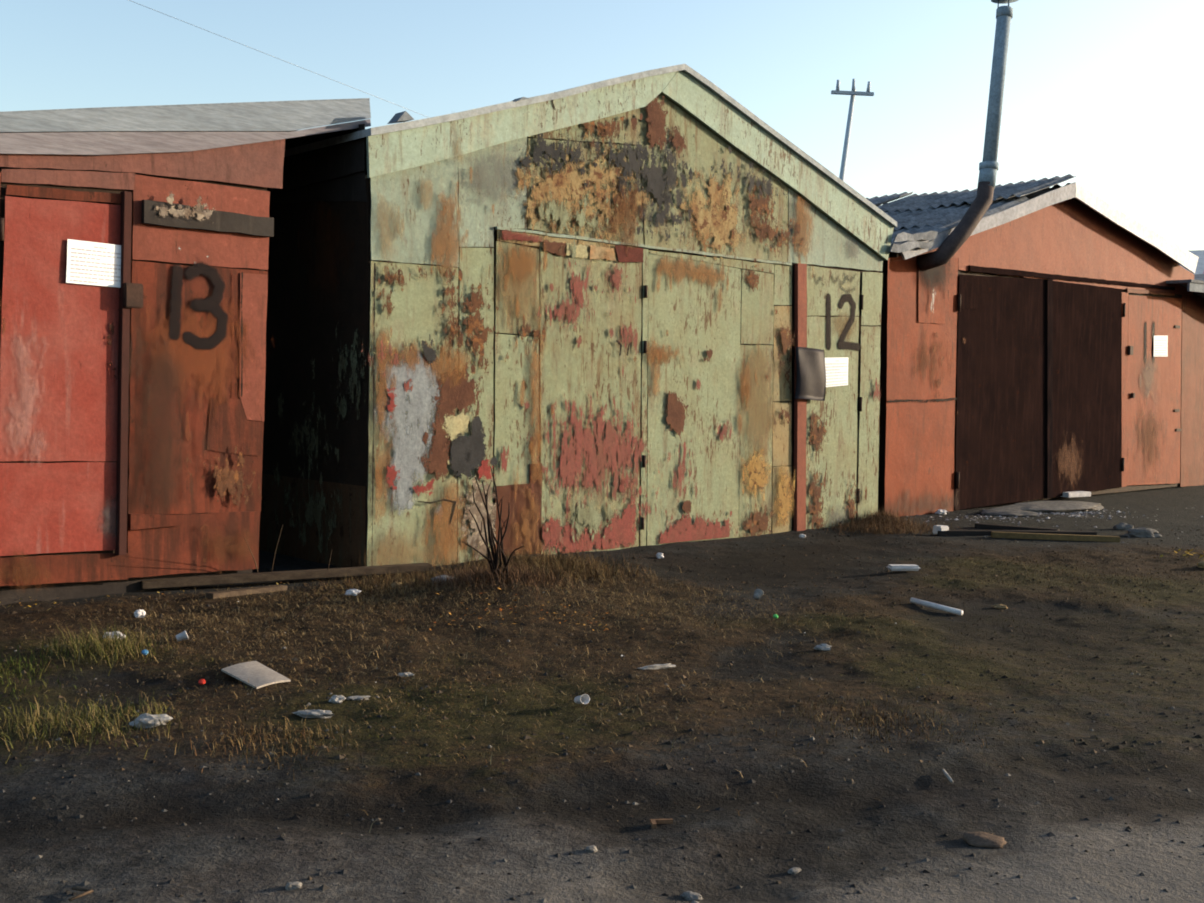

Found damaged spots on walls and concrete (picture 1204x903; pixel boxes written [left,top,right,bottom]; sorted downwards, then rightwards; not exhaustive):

corrosion [431,167,472,274]
corrosion [656,147,813,310]
peeling [711,146,795,253]
peeling [502,95,740,554]
peeling [332,261,510,561]
corrosion [737,448,867,537]